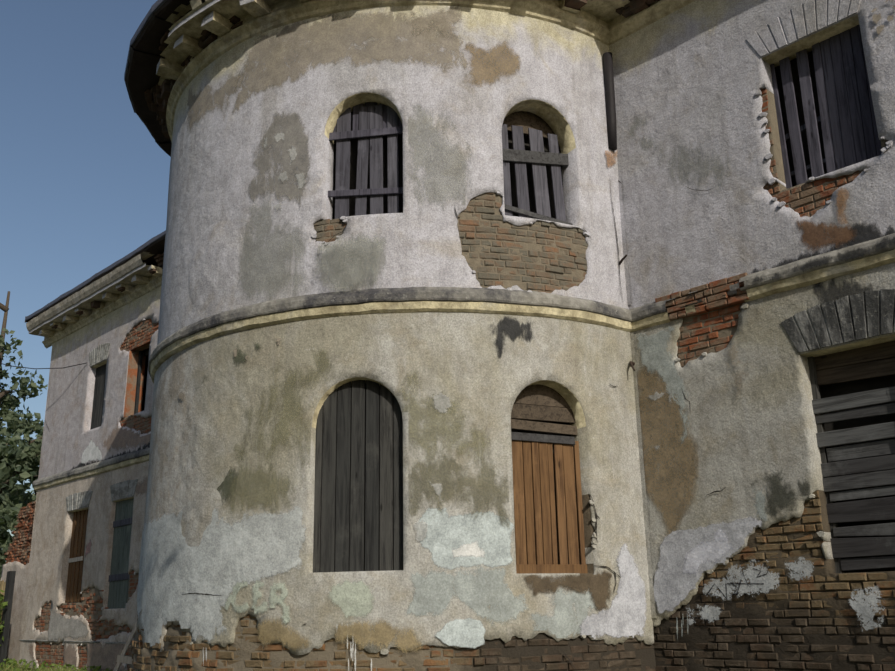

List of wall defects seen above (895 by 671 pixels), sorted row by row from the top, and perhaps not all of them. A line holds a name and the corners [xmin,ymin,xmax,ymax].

damp [187,6,520,130]
damp [249,113,310,204]
flaking render [755,88,869,217]
flaking render [311,216,348,246]
flaking render [457,191,590,293]
flaking render [655,272,749,368]
flaking render [2,501,36,567]
damp [217,469,288,508]
damp [403,376,509,522]
flaking render [34,490,895,671]
damp [637,367,699,534]
damp [767,474,810,516]